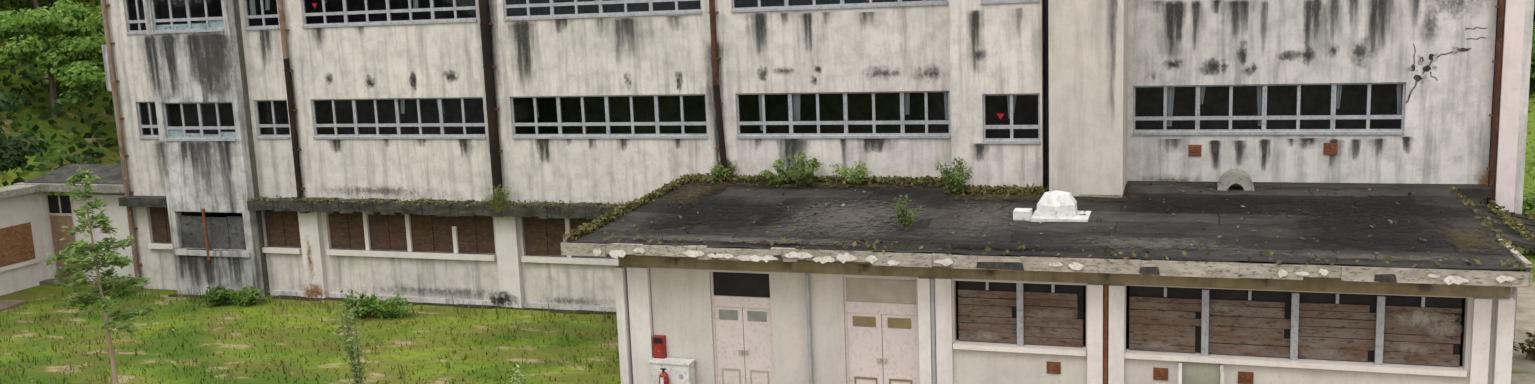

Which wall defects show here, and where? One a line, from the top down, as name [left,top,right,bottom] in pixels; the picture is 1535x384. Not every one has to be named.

damp [144,34,227,89]
damp [513,22,530,66]
damp [756,14,765,41]
damp [1165,0,1247,66]
damp [1203,42,1256,74]
damp [1302,0,1334,60]
crack [1405,27,1488,103]
peeling [593,247,646,258]
peeling [683,250,899,266]
peeling [1049,262,1084,270]
peeling [1278,269,1329,278]
peeling [1427,274,1469,285]